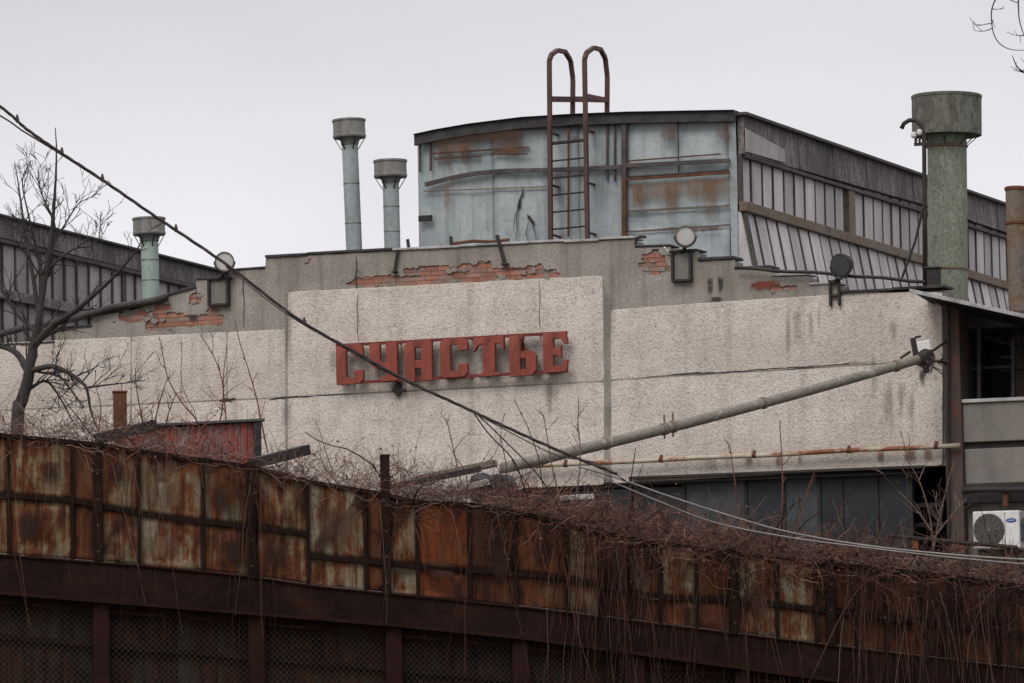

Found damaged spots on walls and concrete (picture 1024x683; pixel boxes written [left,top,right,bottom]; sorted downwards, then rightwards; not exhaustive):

rust [633,179,723,206]
leakage [513,188,536,238]
flaking render [344,258,560,287]
flaking render [639,251,670,275]
flaking render [112,293,224,331]